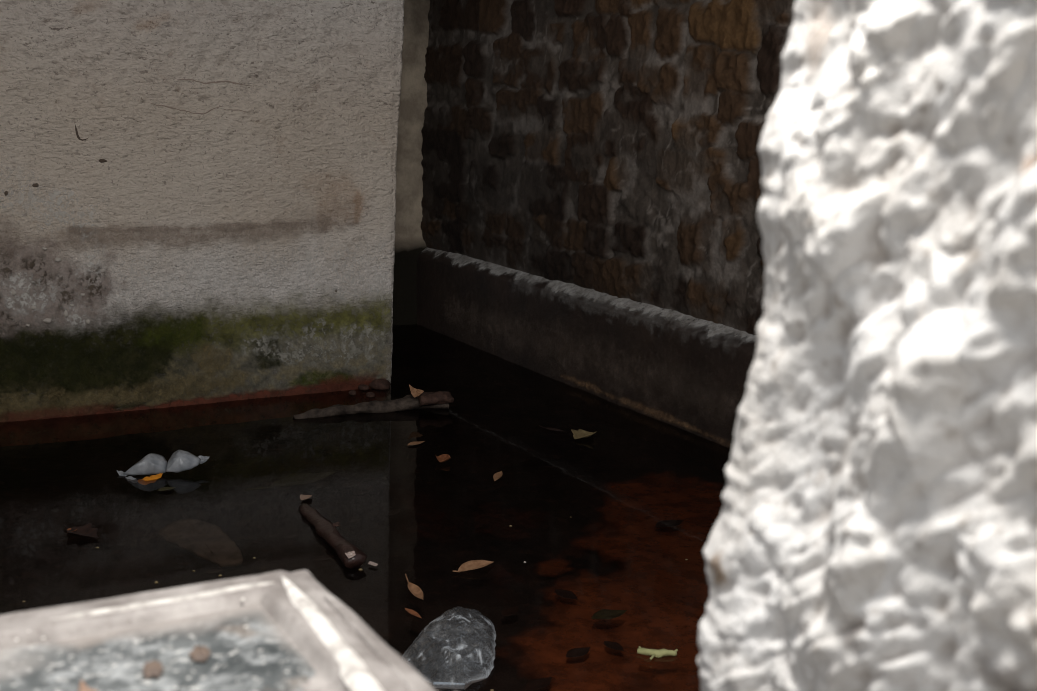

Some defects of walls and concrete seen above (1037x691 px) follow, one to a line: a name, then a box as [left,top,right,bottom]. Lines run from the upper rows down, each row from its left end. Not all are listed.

water stain [0,318,203,394]